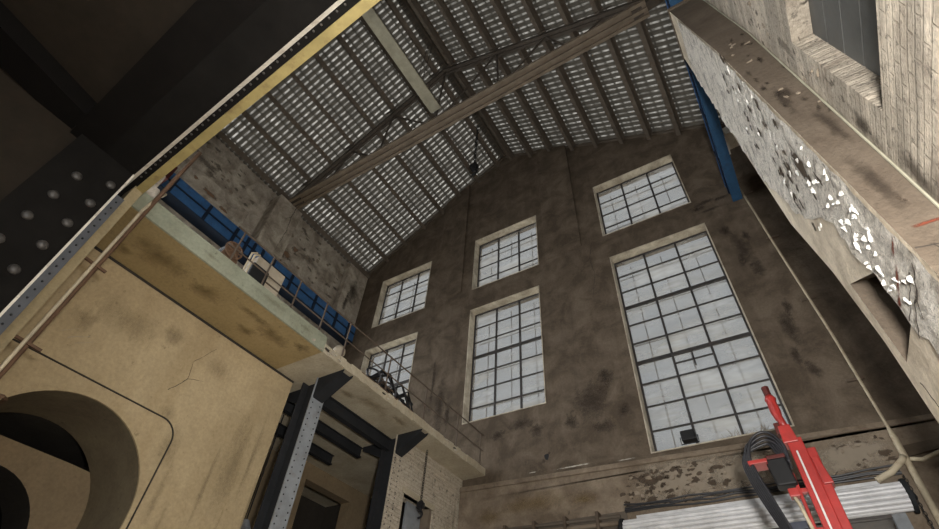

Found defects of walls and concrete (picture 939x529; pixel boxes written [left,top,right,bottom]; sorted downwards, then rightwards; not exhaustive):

crack [908,243,939,338]
flaking render [620,455,770,504]
flaking render [819,435,898,475]